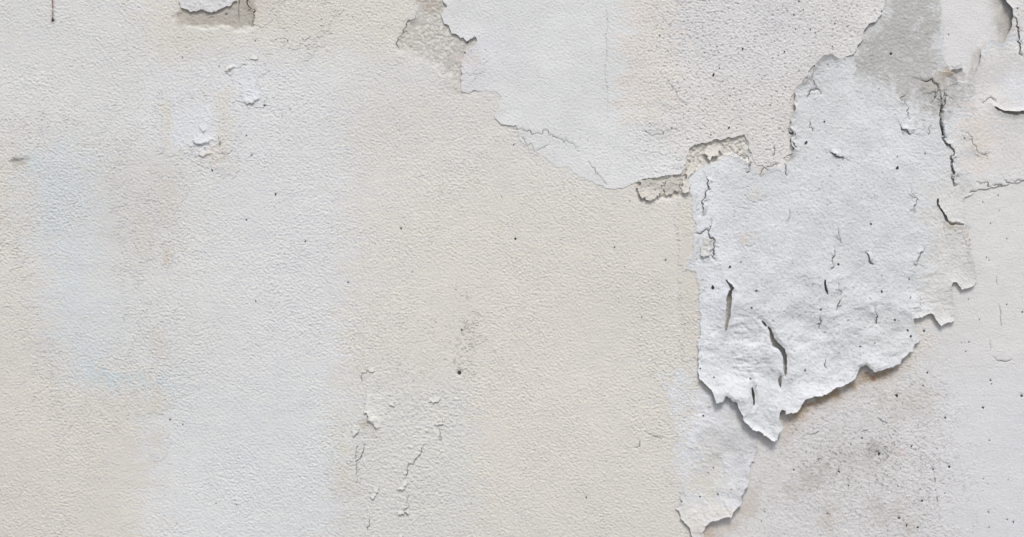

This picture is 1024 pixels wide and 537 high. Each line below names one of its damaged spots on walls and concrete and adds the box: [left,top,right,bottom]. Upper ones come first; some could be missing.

spalling [170,0,253,30]
crack [921,78,1024,193]
peeling [395,0,1024,537]
peeling [351,367,395,479]